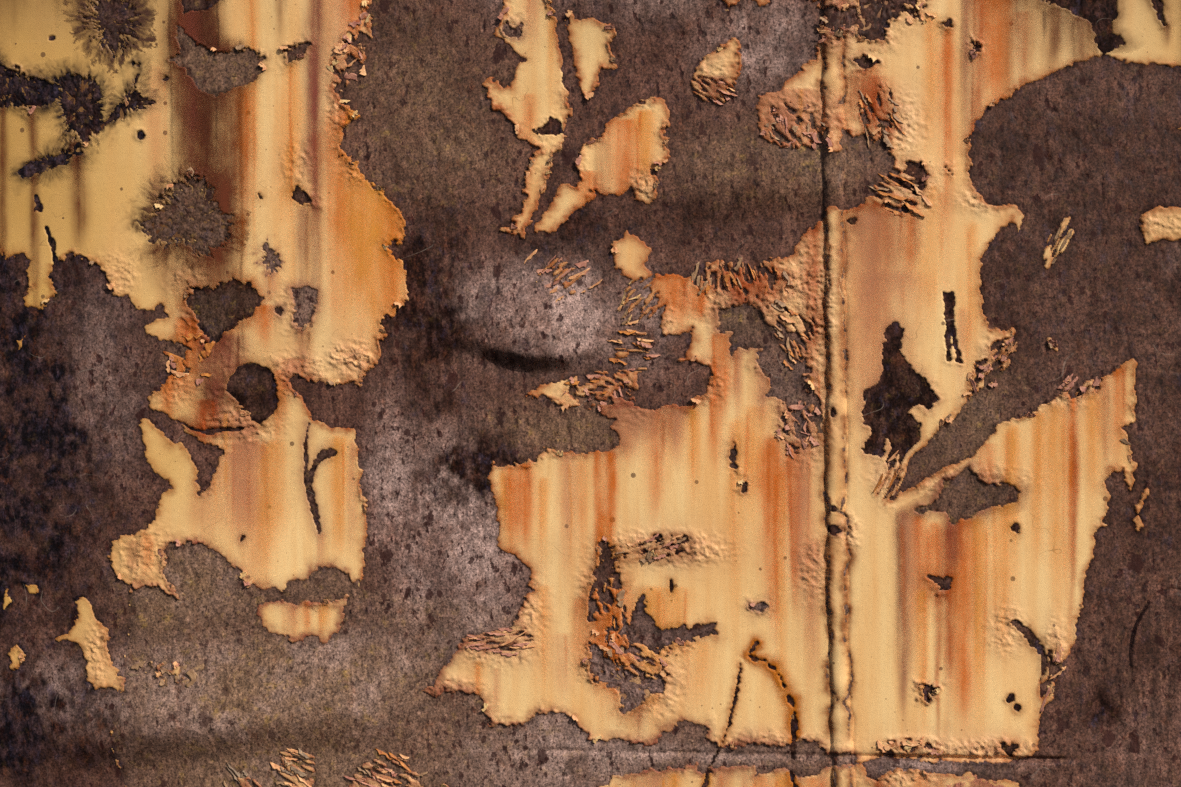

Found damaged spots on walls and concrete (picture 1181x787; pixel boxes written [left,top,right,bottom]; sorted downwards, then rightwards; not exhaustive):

peeling [332,12,369,87]
peeling [759,104,827,150]
peeling [163,333,215,386]
corrosion [0,0,929,787]
peeling [524,249,602,303]
peeling [563,280,660,412]
peeling [691,257,808,370]
peeling [775,401,822,458]
corrosion [861,0,1181,787]
peeling [591,590,640,666]
crack [701,637,802,787]
peeling [270,748,312,787]